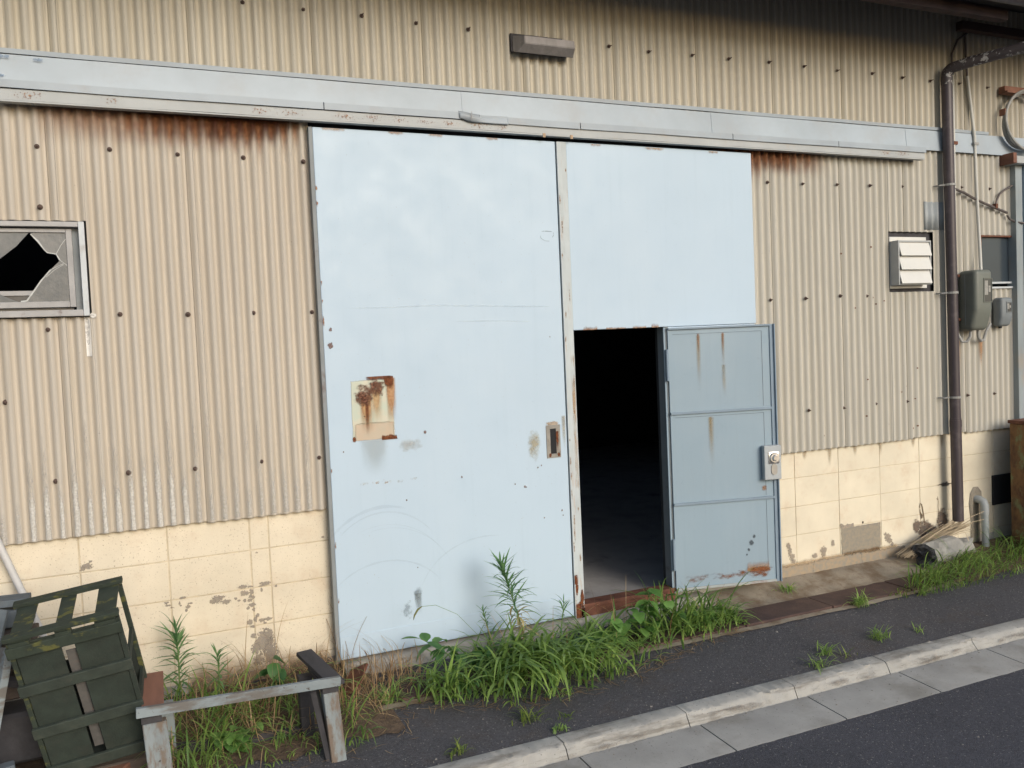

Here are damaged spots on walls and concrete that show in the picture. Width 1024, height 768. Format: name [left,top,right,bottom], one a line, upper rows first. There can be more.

rust [51,98,303,137]
rust [709,149,810,169]
peeling [782,522,905,578]
rust [723,565,770,577]
spalling [210,581,279,665]